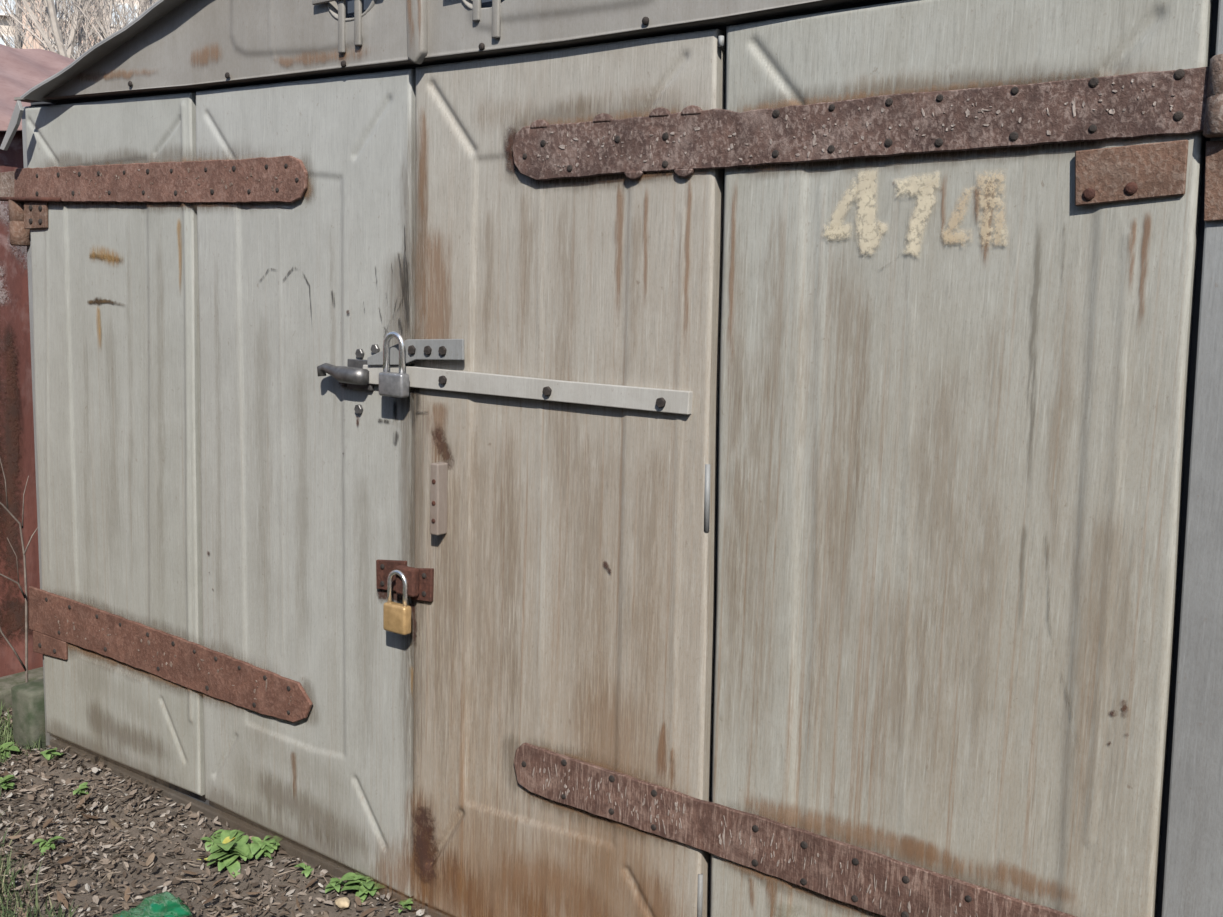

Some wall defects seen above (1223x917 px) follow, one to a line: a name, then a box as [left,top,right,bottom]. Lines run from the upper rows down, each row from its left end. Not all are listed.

rust [505,129,516,170]
rust [90,248,120,263]
rust [1131,217,1151,304]
rust [88,297,116,342]
rust [433,428,452,465]
rust [0,329,34,639]